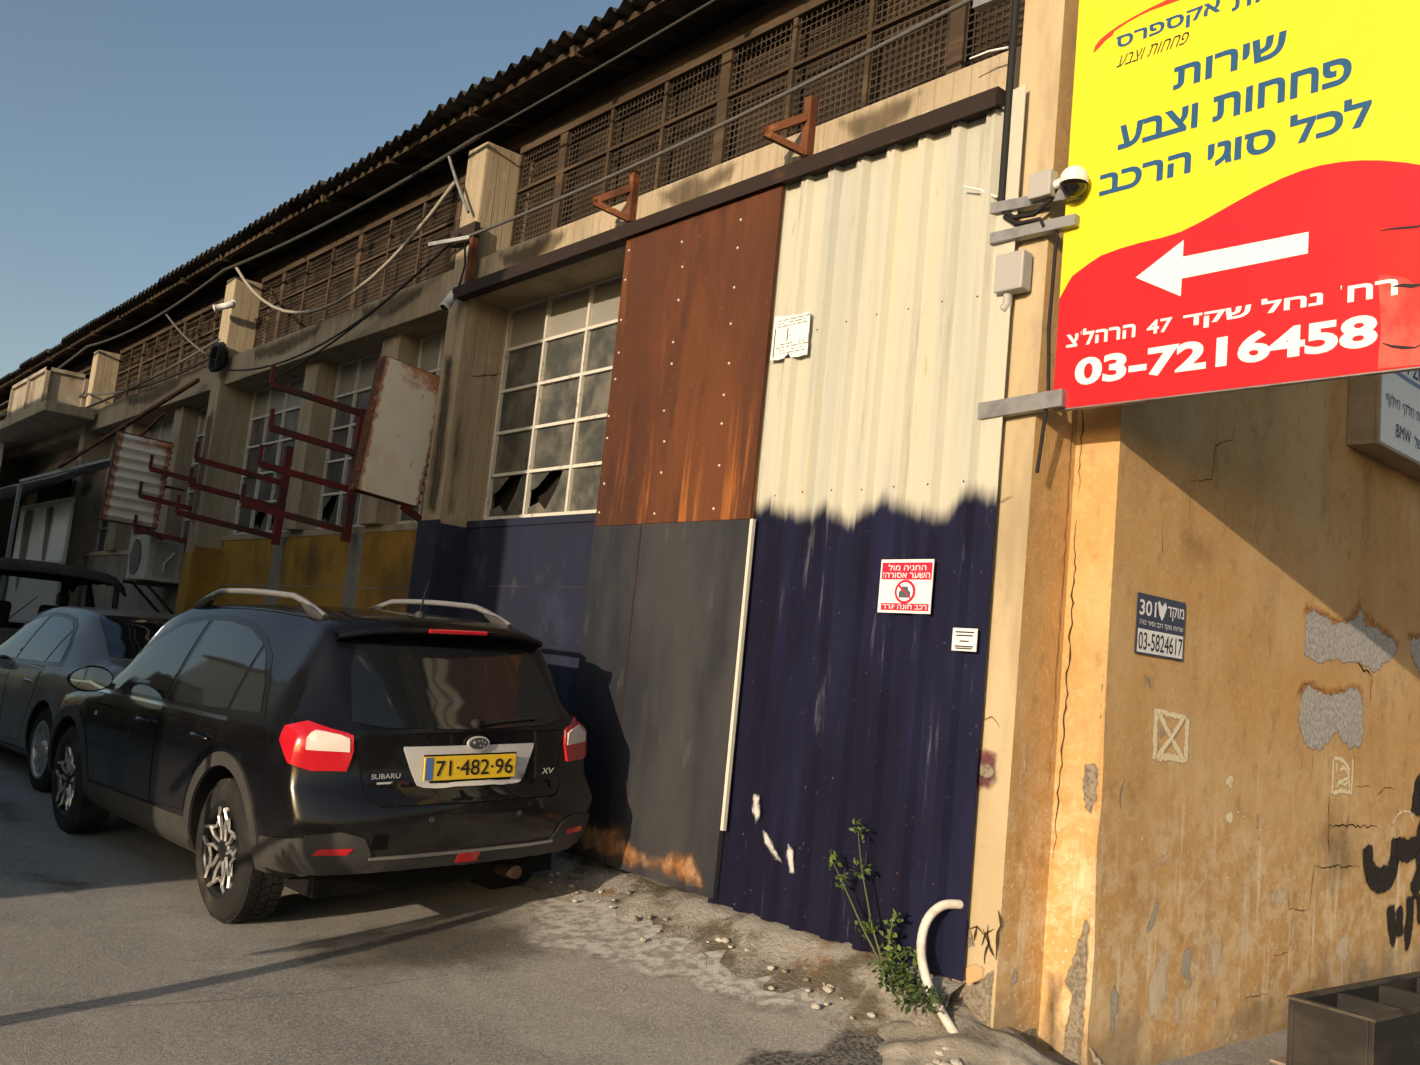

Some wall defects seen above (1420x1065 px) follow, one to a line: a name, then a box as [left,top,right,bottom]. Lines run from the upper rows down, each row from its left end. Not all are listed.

rust [595,183,786,526]
crack [1161,413,1236,561]
peeling [1302,601,1420,672]
peeling [1296,681,1363,750]
rust [577,824,701,883]